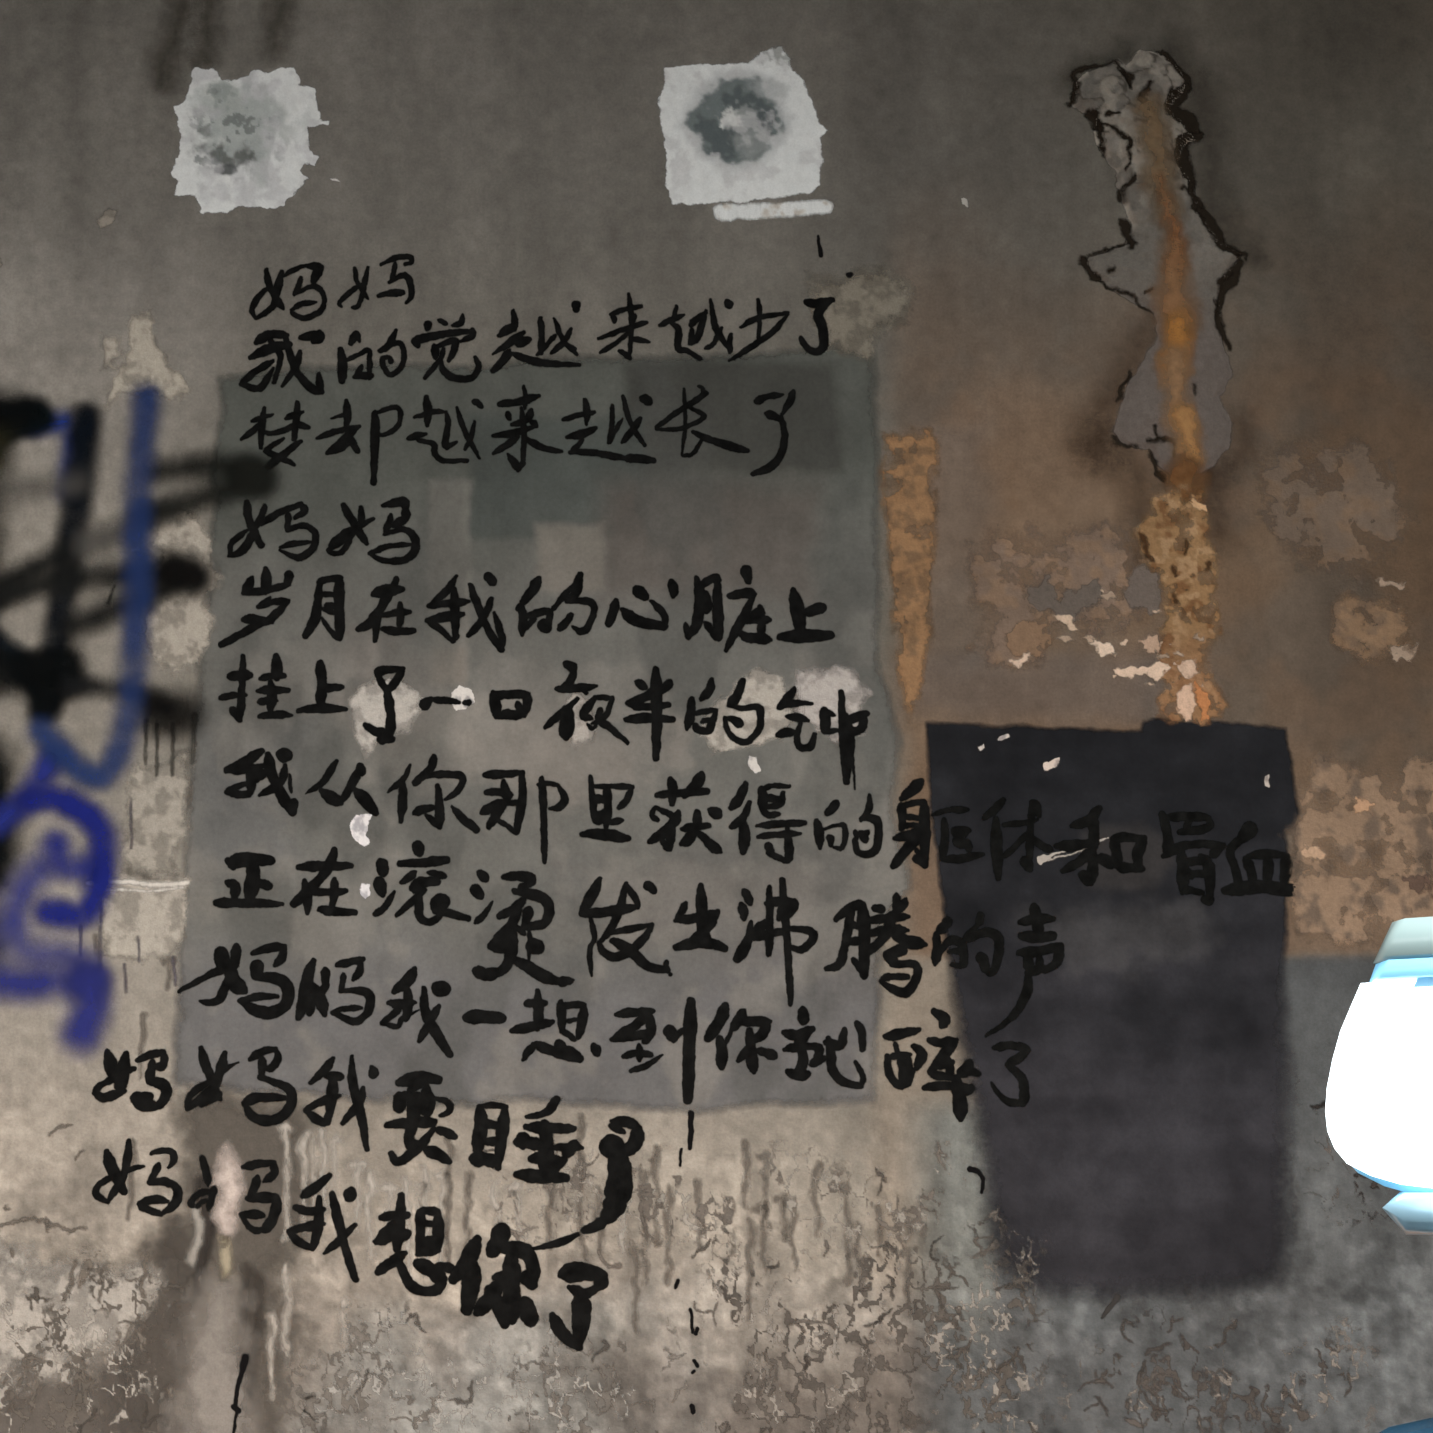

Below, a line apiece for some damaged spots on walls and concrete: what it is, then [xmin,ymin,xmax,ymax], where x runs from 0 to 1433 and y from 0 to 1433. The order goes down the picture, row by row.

rust [1133,97,1205,504]
peeling [879,428,939,712]
peeling [966,485,1228,725]
peeling [1255,440,1418,666]
peeling [1288,753,1433,946]
crack [0,1205,104,1303]
crack [49,1124,83,1161]
crack [139,1252,151,1298]